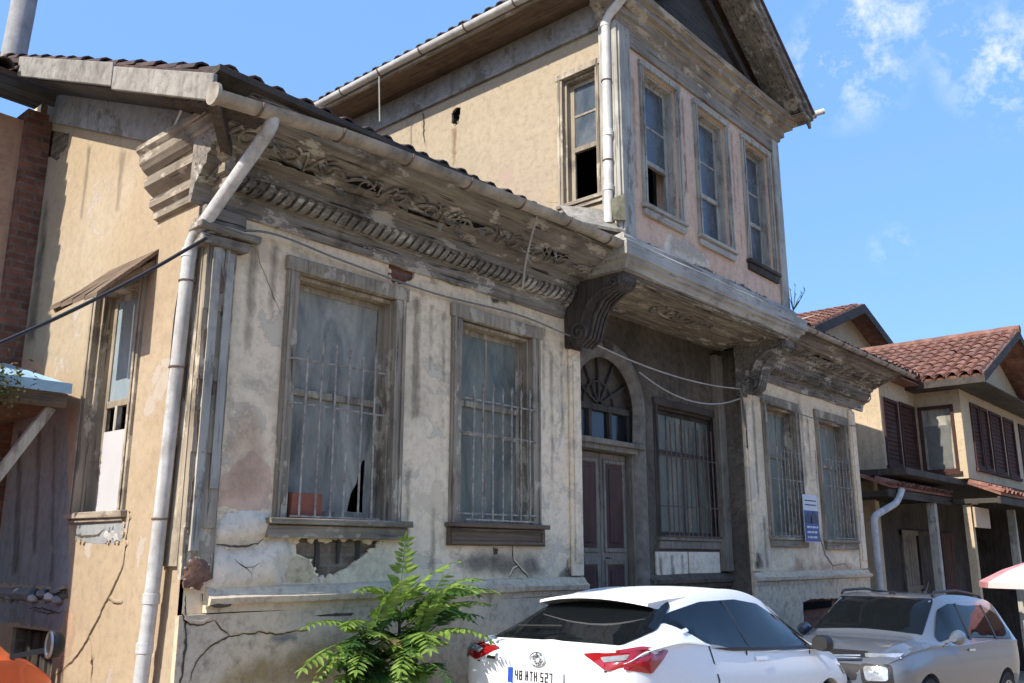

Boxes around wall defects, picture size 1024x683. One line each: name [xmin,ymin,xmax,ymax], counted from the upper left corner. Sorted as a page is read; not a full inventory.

hole [450,107,461,126]
spalling [386,264,413,287]
flaking render [0,408,126,630]
crack [53,511,132,680]
crack [179,587,311,683]
spalling [285,538,383,583]